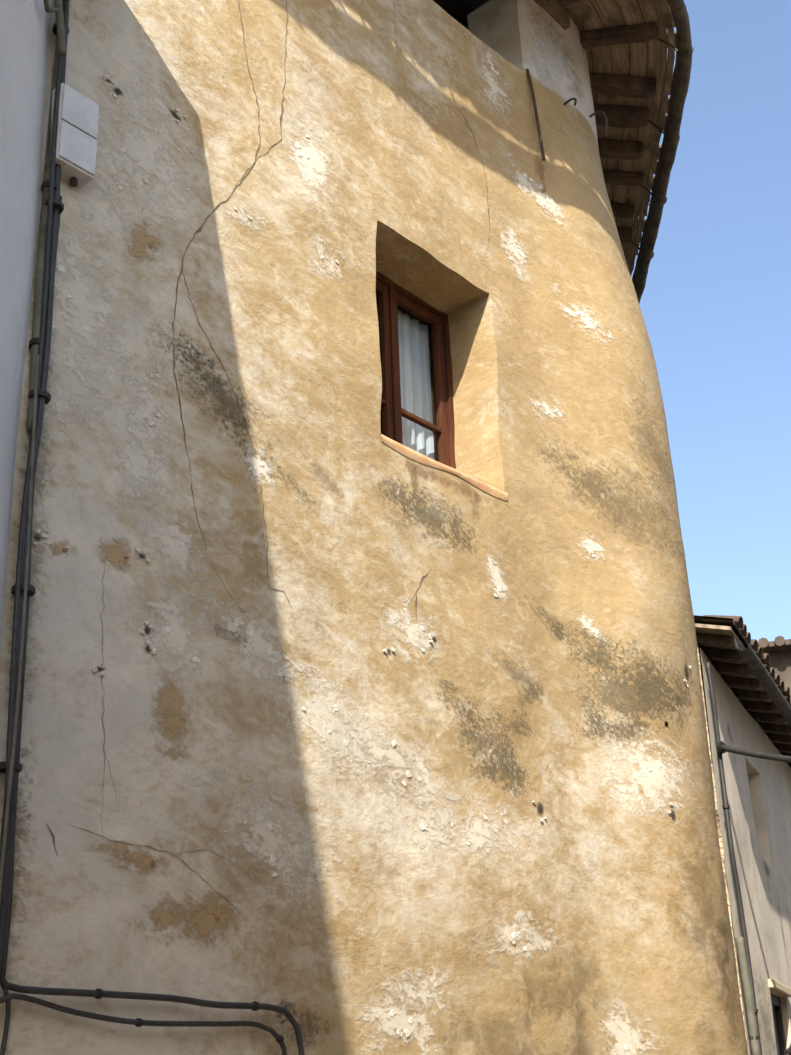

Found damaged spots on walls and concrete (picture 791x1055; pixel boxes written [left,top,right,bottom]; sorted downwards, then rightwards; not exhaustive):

crack [172,0,291,618]
mould [168,342,312,508]
leakage [386,479,471,548]
crack [46,529,258,929]
mould [442,680,530,795]
mould [539,609,691,743]